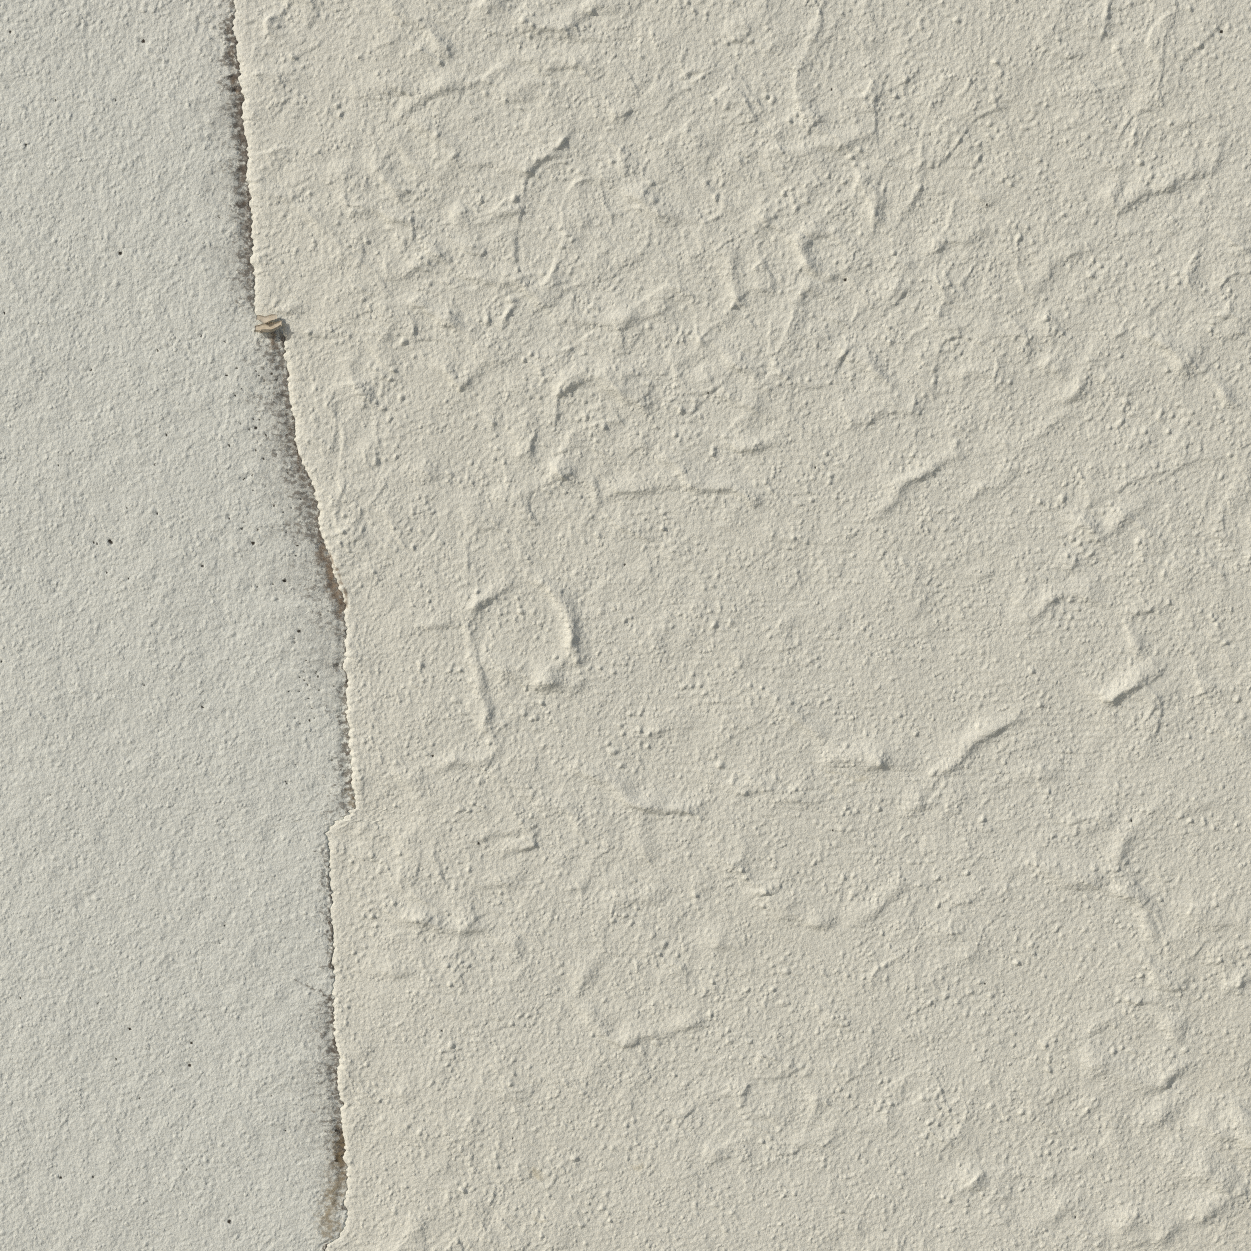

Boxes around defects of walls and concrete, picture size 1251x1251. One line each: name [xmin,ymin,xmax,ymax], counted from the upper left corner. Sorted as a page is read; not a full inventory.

crack [225,15,253,265]
peeling [254,314,282,333]
crack [301,472,352,789]
crack [306,877,344,1133]